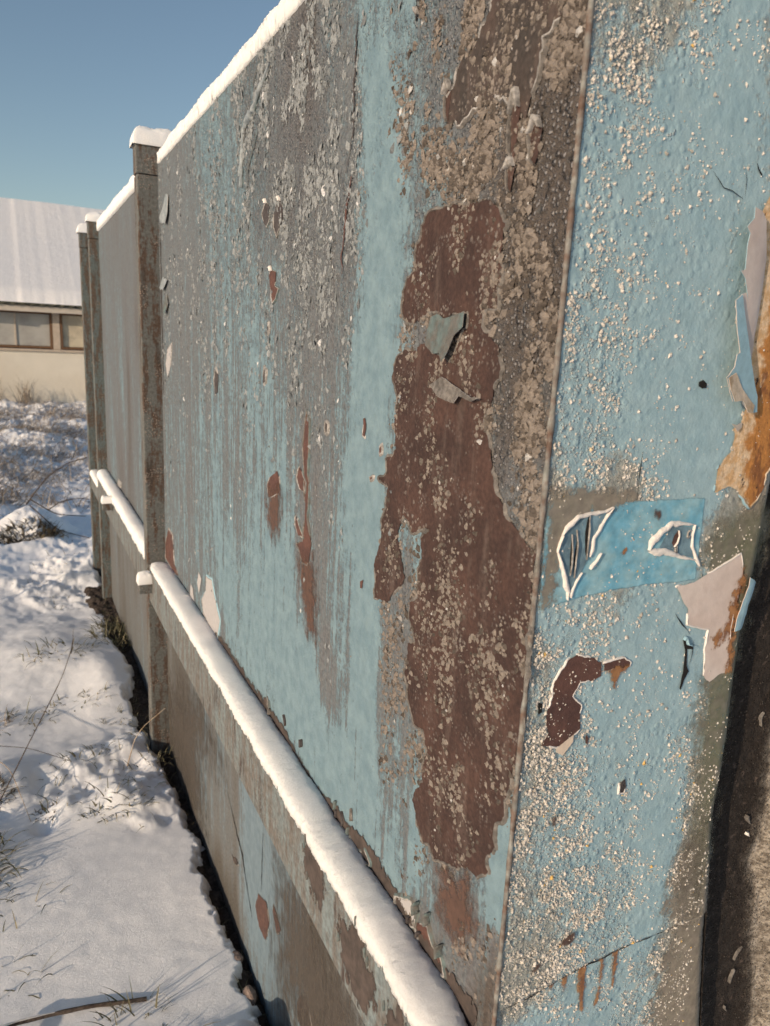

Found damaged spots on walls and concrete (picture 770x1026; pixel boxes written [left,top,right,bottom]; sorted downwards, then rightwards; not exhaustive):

peeling [440,0,566,192]
corrosion [713,197,770,510]
corrosion [265,485,283,539]
corrosion [296,551,317,647]
peeling [159,0,477,1026]
peeling [351,198,632,880]
peeling [675,553,756,682]
corrosion [549,950,618,1012]